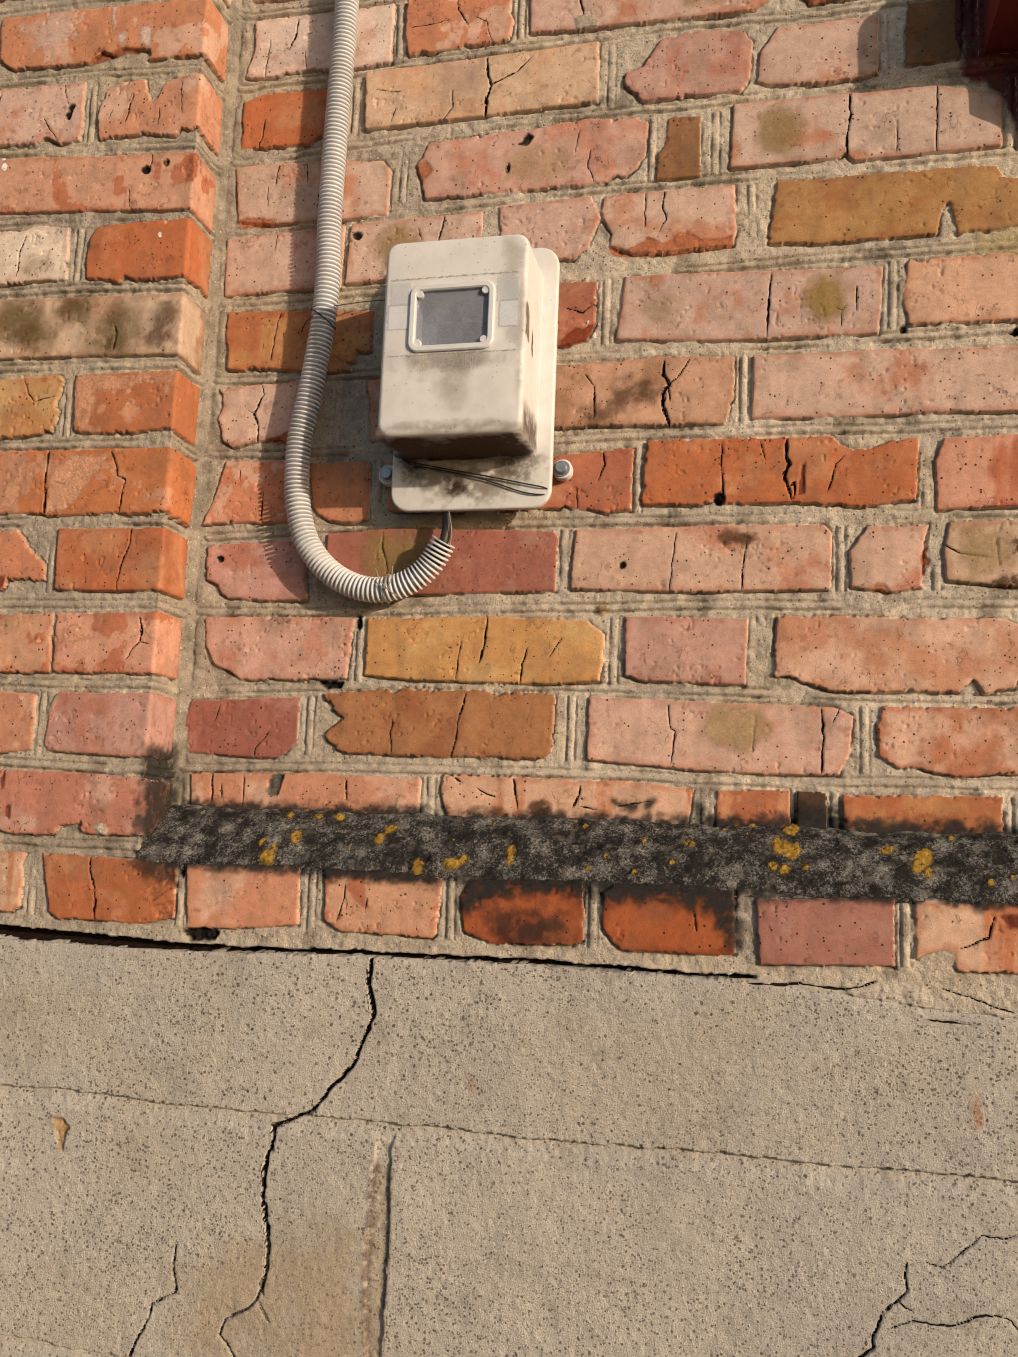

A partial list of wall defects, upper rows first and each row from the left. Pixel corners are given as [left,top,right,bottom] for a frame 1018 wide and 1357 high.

crack [412,0,530,122]
crack [660,359,690,428]
crack [718,444,726,495]
crack [760,440,796,500]
crack [961,917,995,949]
crack [927,988,1016,1025]
crack [0,859,876,1357]
crack [858,1235,1018,1357]